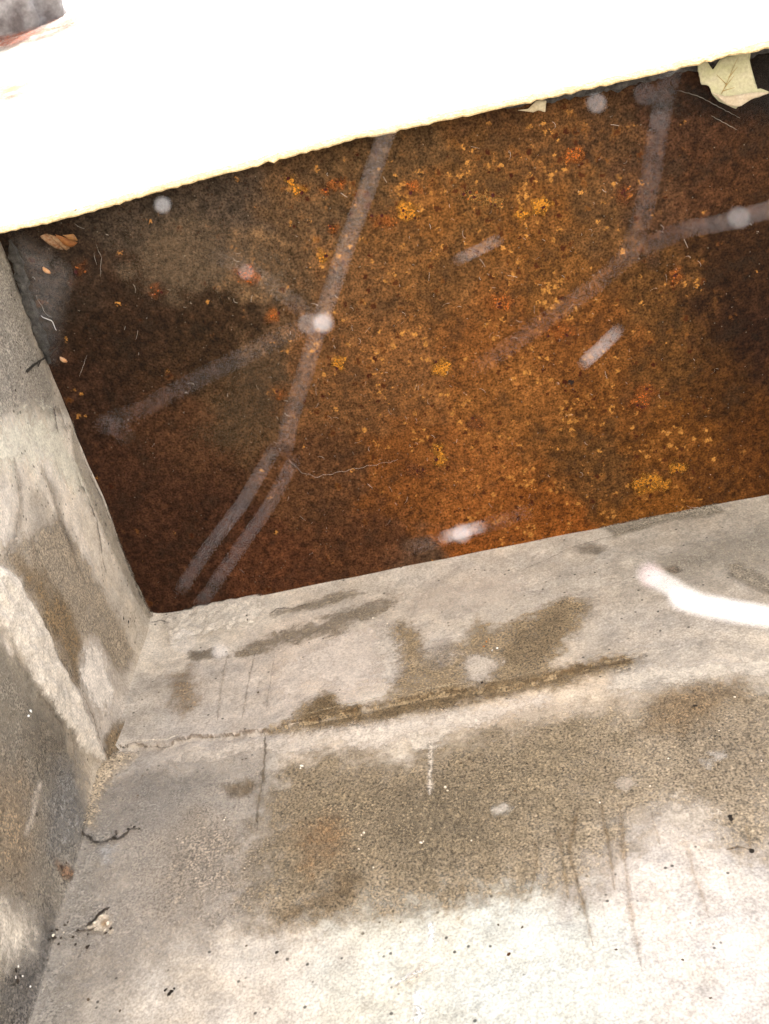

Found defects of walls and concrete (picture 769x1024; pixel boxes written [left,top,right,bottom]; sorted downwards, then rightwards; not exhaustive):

rust [565,147,585,164]
rust [285,177,345,195]
rust [368,180,422,228]
rust [462,189,503,209]
rust [516,198,554,220]
rust [234,265,260,285]
rust [433,359,451,376]
rust [405,444,447,479]
leakage [0,258,133,710]
rust [632,463,686,496]
crack [120,654,632,831]
leakage [0,591,769,1024]